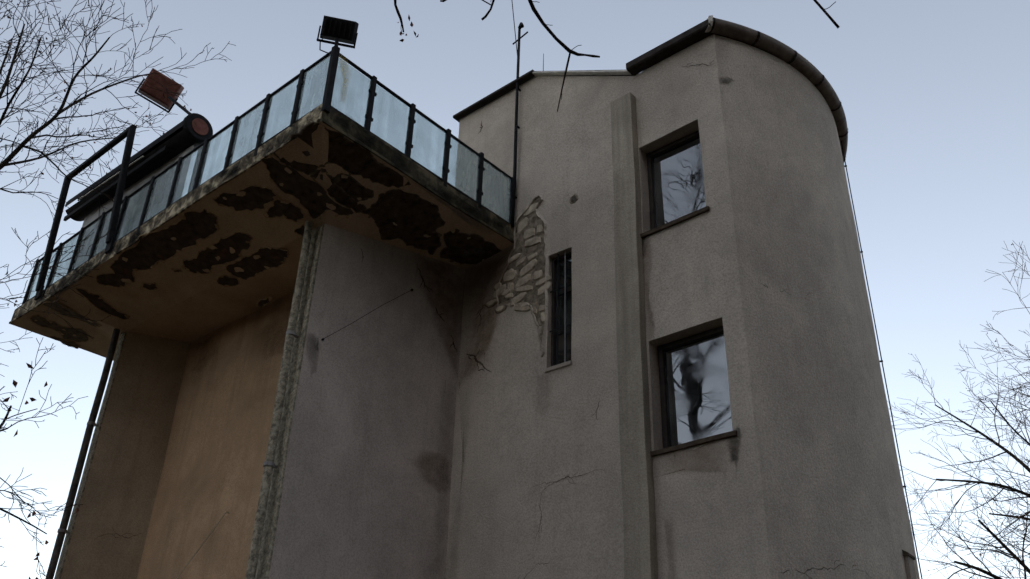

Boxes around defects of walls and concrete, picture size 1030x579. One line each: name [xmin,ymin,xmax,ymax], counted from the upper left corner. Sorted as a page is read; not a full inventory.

spalling [30,122,551,357]
crack [418,268,491,372]